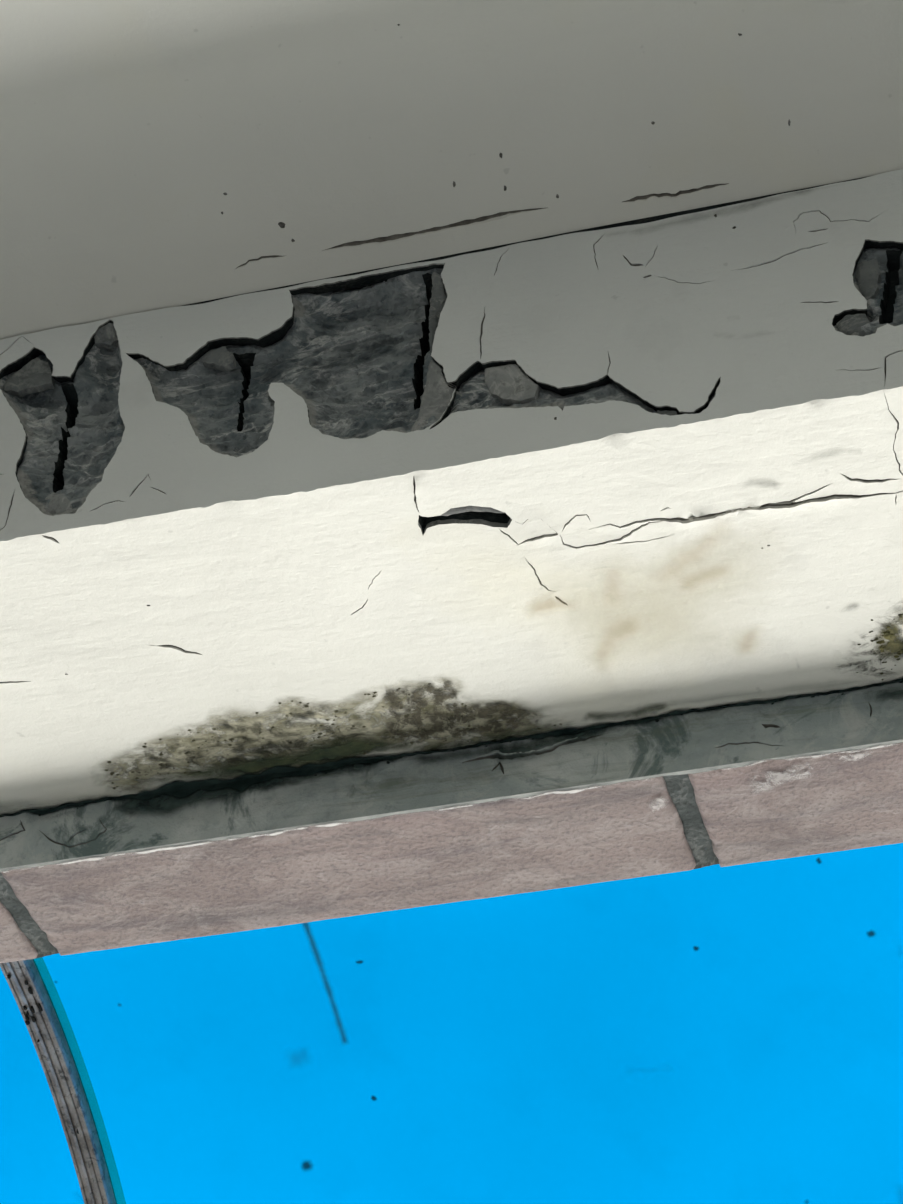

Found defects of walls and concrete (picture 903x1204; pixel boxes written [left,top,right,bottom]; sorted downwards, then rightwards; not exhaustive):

crack [182,175,887,306]
spalling [832,239,903,336]
spalling [0,263,721,516]
spalling [418,506,512,535]
crack [499,350,903,605]
damp [0,678,903,817]